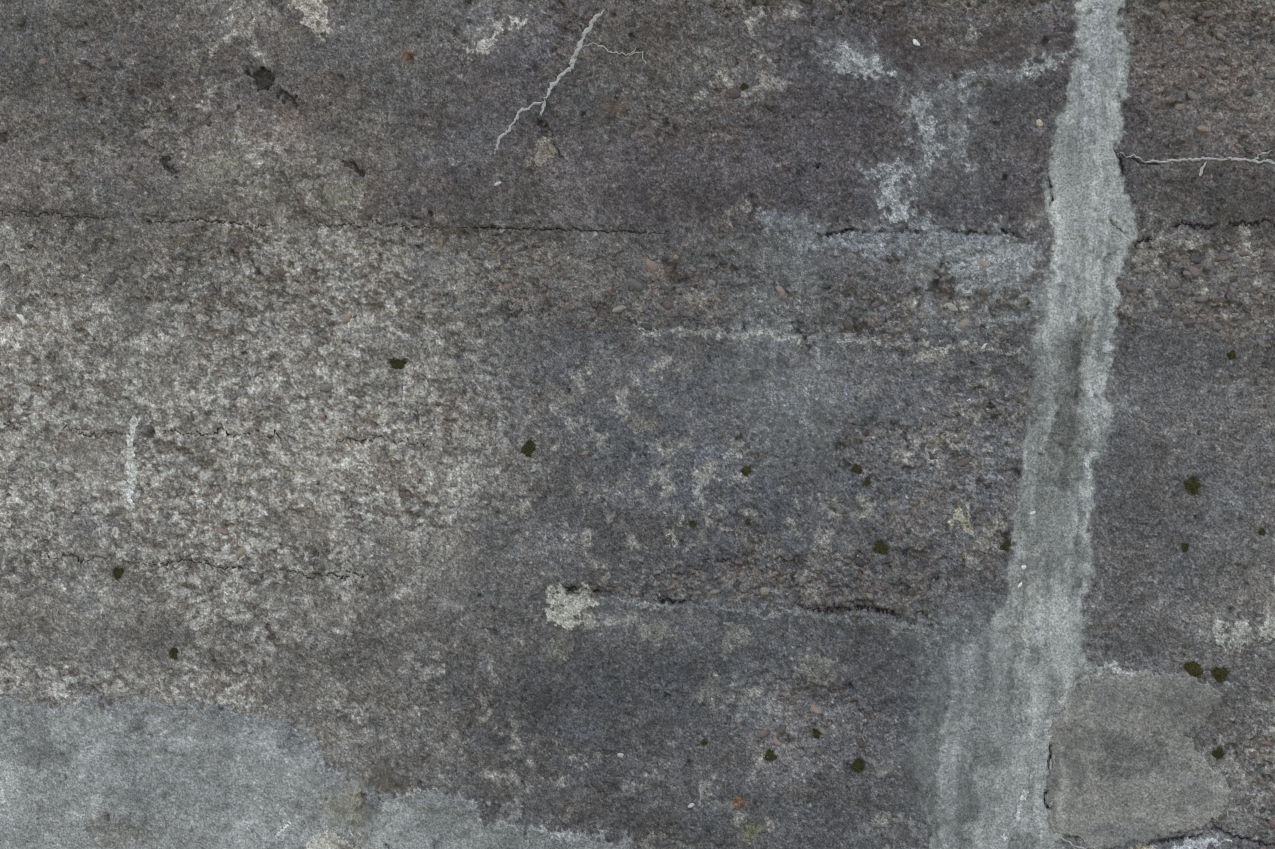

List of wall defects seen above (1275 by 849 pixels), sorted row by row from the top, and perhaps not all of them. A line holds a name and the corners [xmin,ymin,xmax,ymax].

crack [494,9,646,154]
crack [1113,149,1275,176]
crack [0,210,669,235]
damp [635,0,1115,460]
crack [1110,218,1271,249]
damp [1054,273,1120,535]
crack [653,597,703,605]
crack [805,605,915,625]
damp [1058,659,1137,707]
damp [998,769,1035,845]
crack [1043,745,1086,849]
crack [1143,827,1275,846]